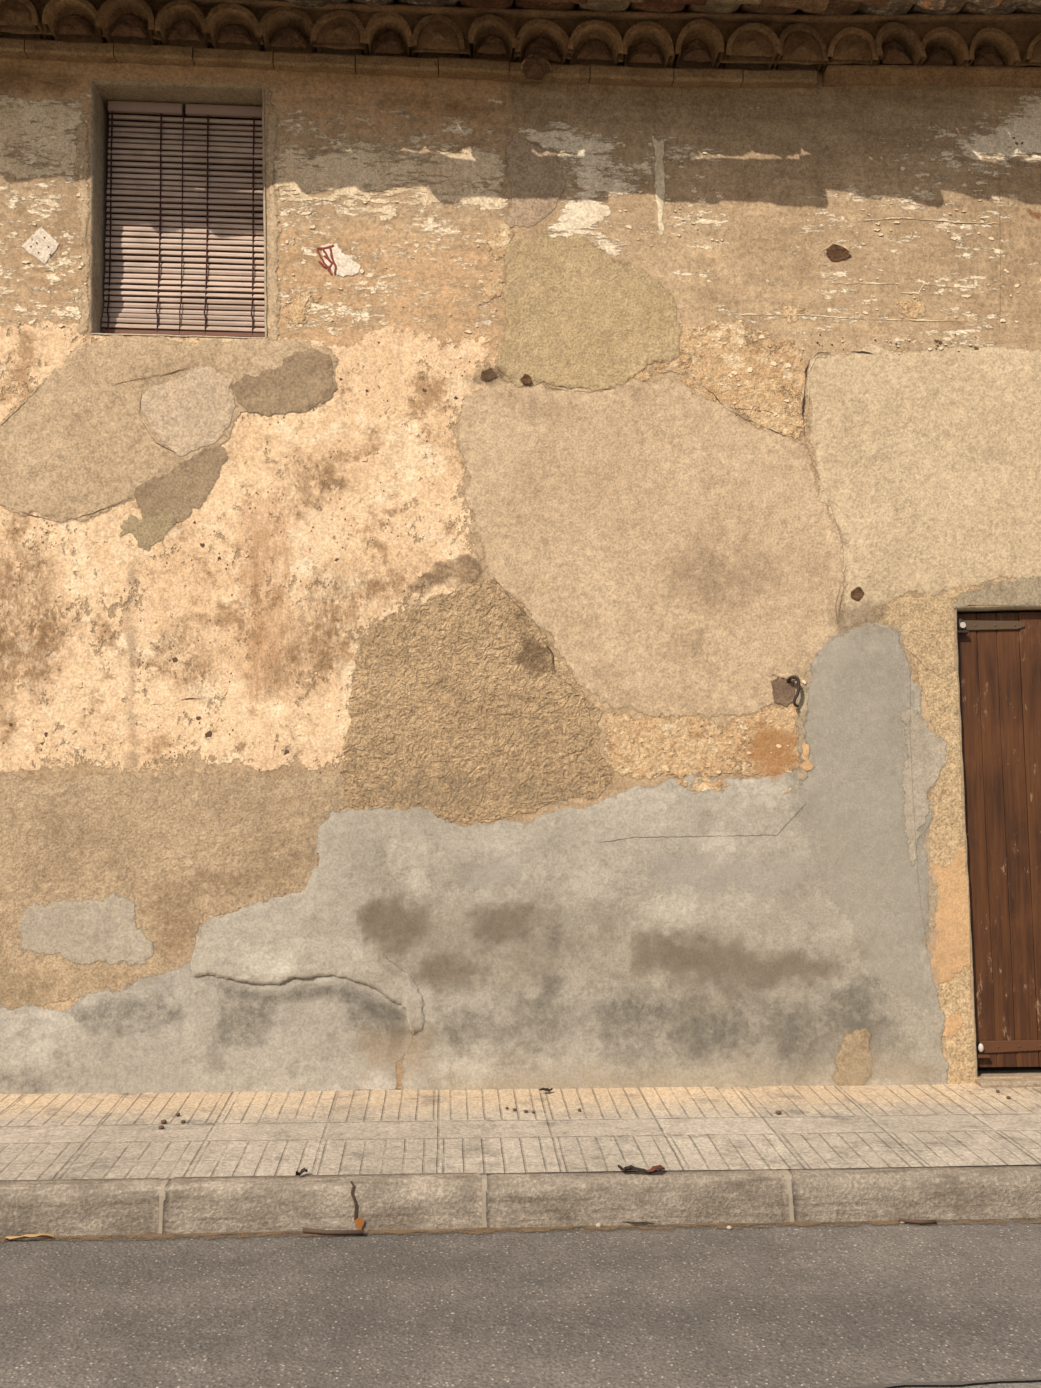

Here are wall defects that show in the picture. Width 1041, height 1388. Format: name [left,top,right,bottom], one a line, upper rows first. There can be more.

peeling [518,121,653,256]
peeling [664,148,728,242]
peeling [852,91,1041,245]
peeling [628,277,989,440]
peeling [0,91,515,773]
crack [703,351,874,620]
water stain [0,559,54,682]
water stain [275,555,480,673]
peeling [604,680,814,794]
spalling [832,1028,873,1086]